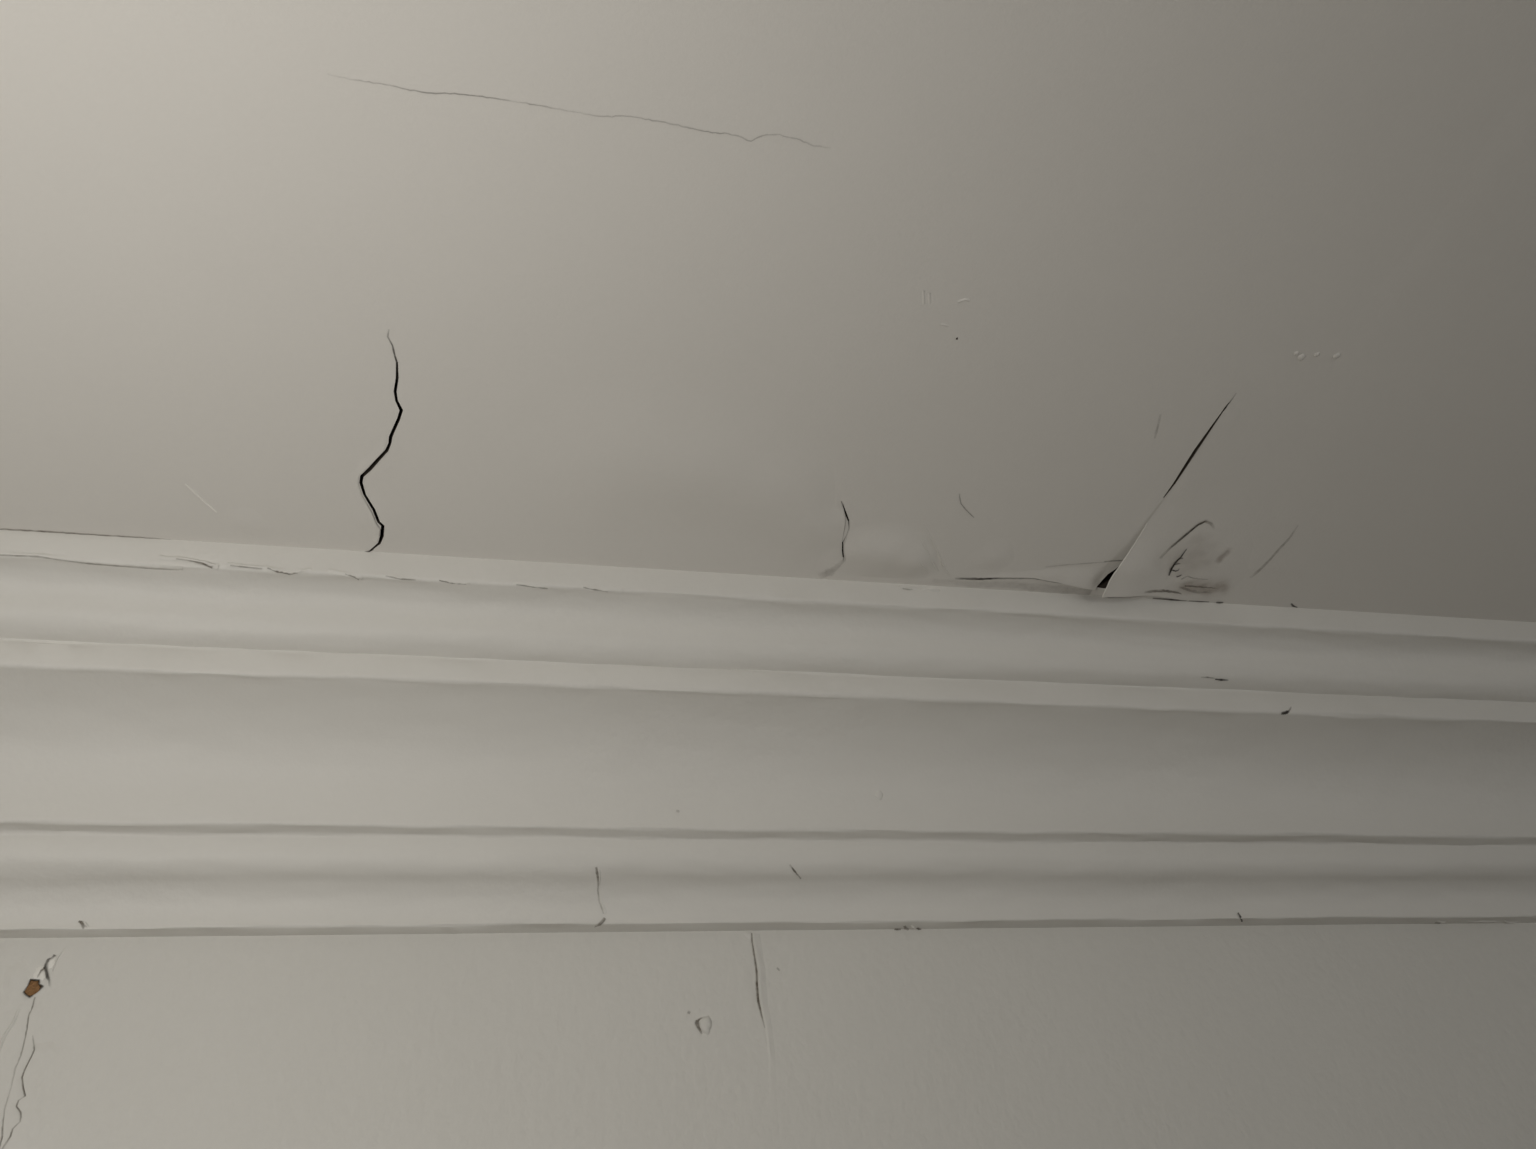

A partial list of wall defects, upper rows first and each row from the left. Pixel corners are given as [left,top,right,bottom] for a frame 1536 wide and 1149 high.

crack [347,344,405,552]
peeling [1097,401,1254,602]